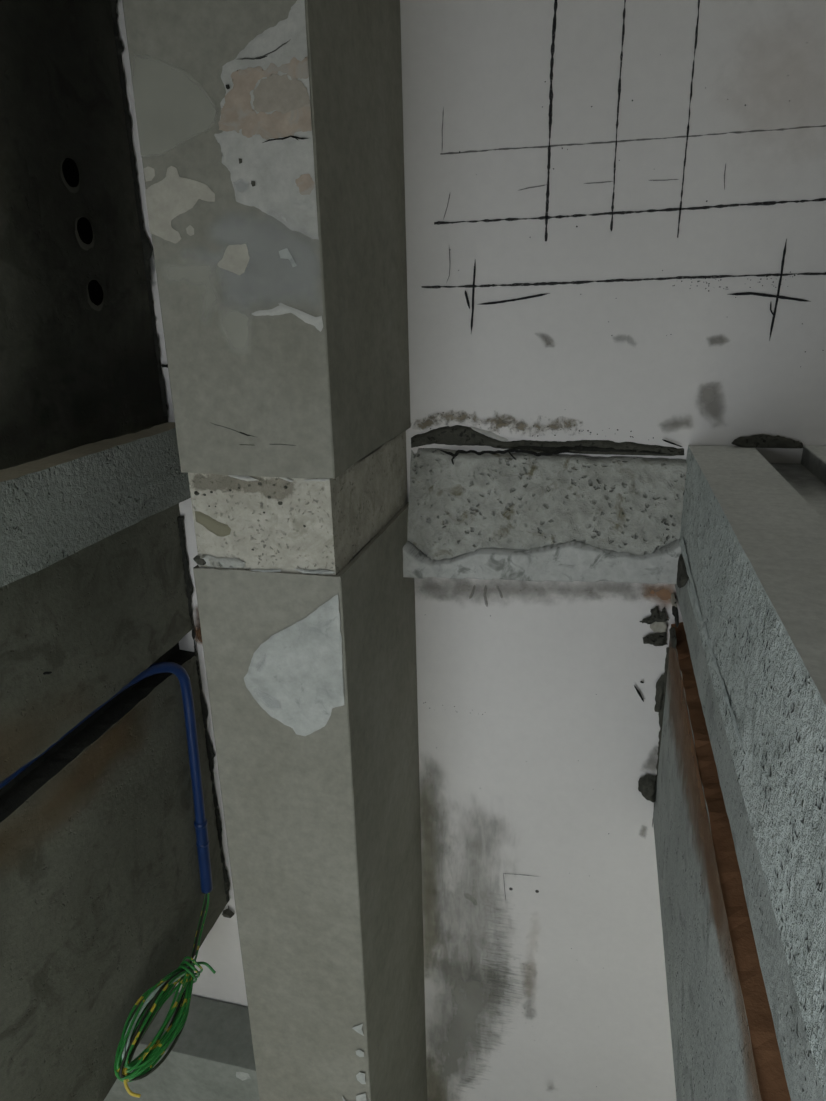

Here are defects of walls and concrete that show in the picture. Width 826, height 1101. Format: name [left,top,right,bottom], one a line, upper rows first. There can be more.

peeling [214,0,319,240]
peeling [252,303,323,332]
crack [437,449,582,465]
spalling [411,425,684,456]
spalling [228,475,329,505]
spalling [193,555,281,573]
rust [195,608,203,644]
water stain [427,769,443,935]
rust [668,639,762,1101]
water stain [431,935,497,1101]